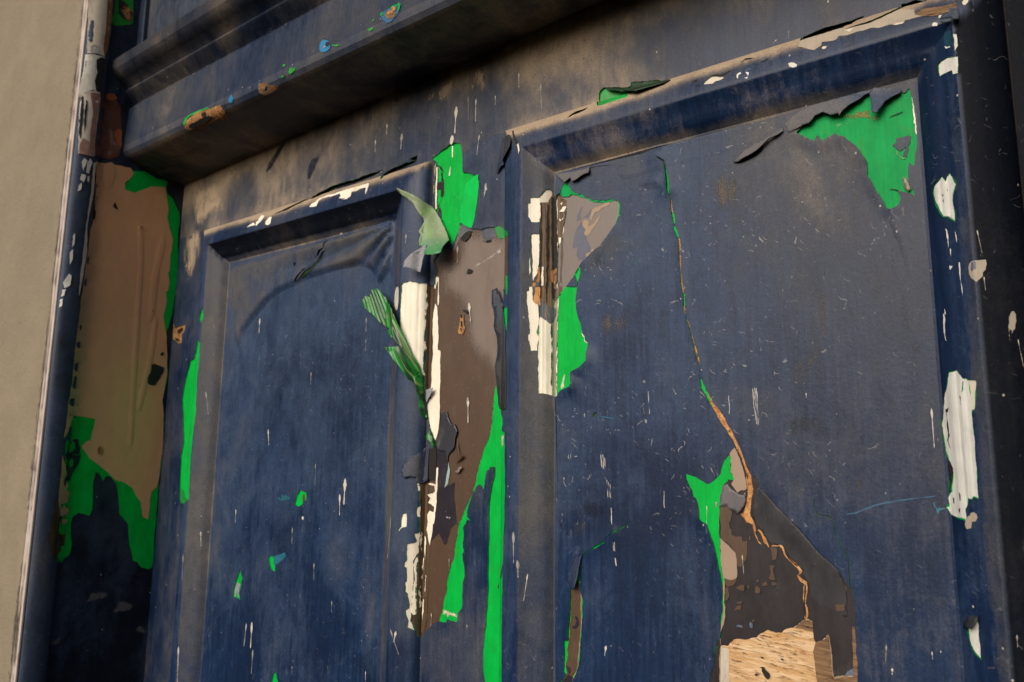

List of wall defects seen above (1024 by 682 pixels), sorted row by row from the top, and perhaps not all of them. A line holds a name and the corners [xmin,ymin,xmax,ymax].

spalling [183,95,233,130]
peeling [598,79,670,106]
peeling [785,87,917,209]
peeling [930,173,956,222]
peeling [49,0,186,569]
peeling [527,165,620,397]
peeling [180,341,200,503]
peeling [362,143,508,682]
crack [657,156,808,619]
peeling [941,370,979,520]
peeling [686,446,858,682]